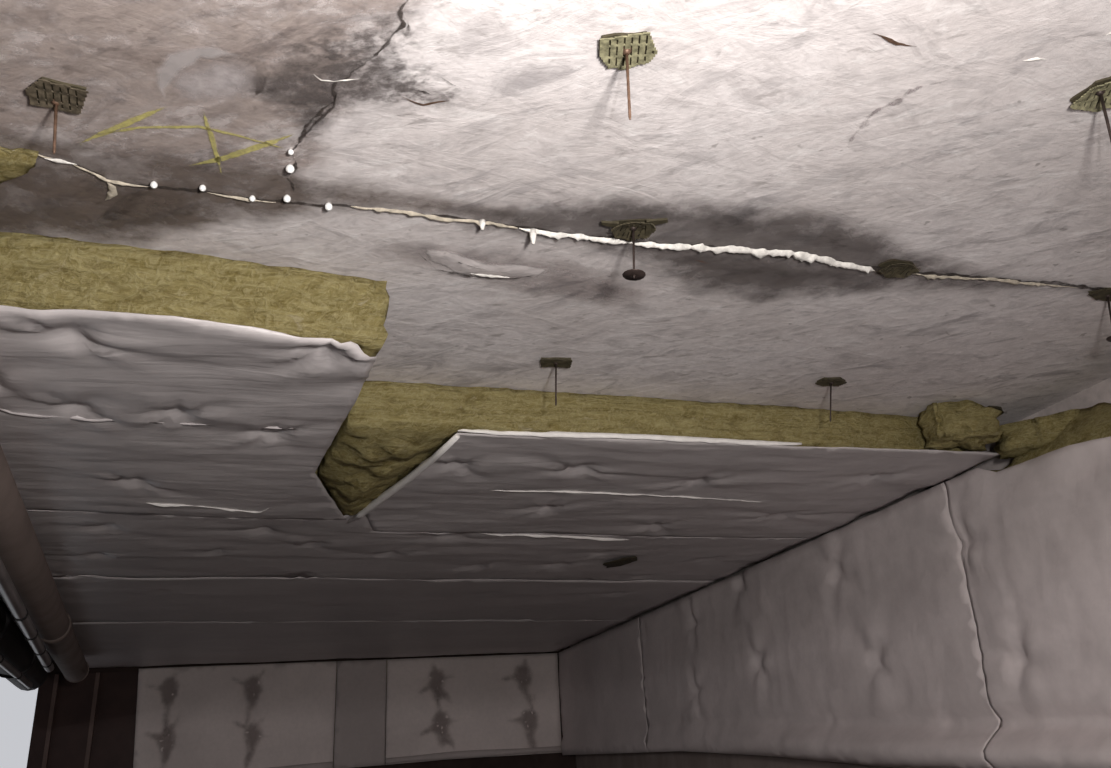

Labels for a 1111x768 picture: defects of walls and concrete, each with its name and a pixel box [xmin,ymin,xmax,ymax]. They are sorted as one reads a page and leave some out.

water stain [0,0,452,240]
crack [13,3,1107,290]
water stain [471,202,1006,299]